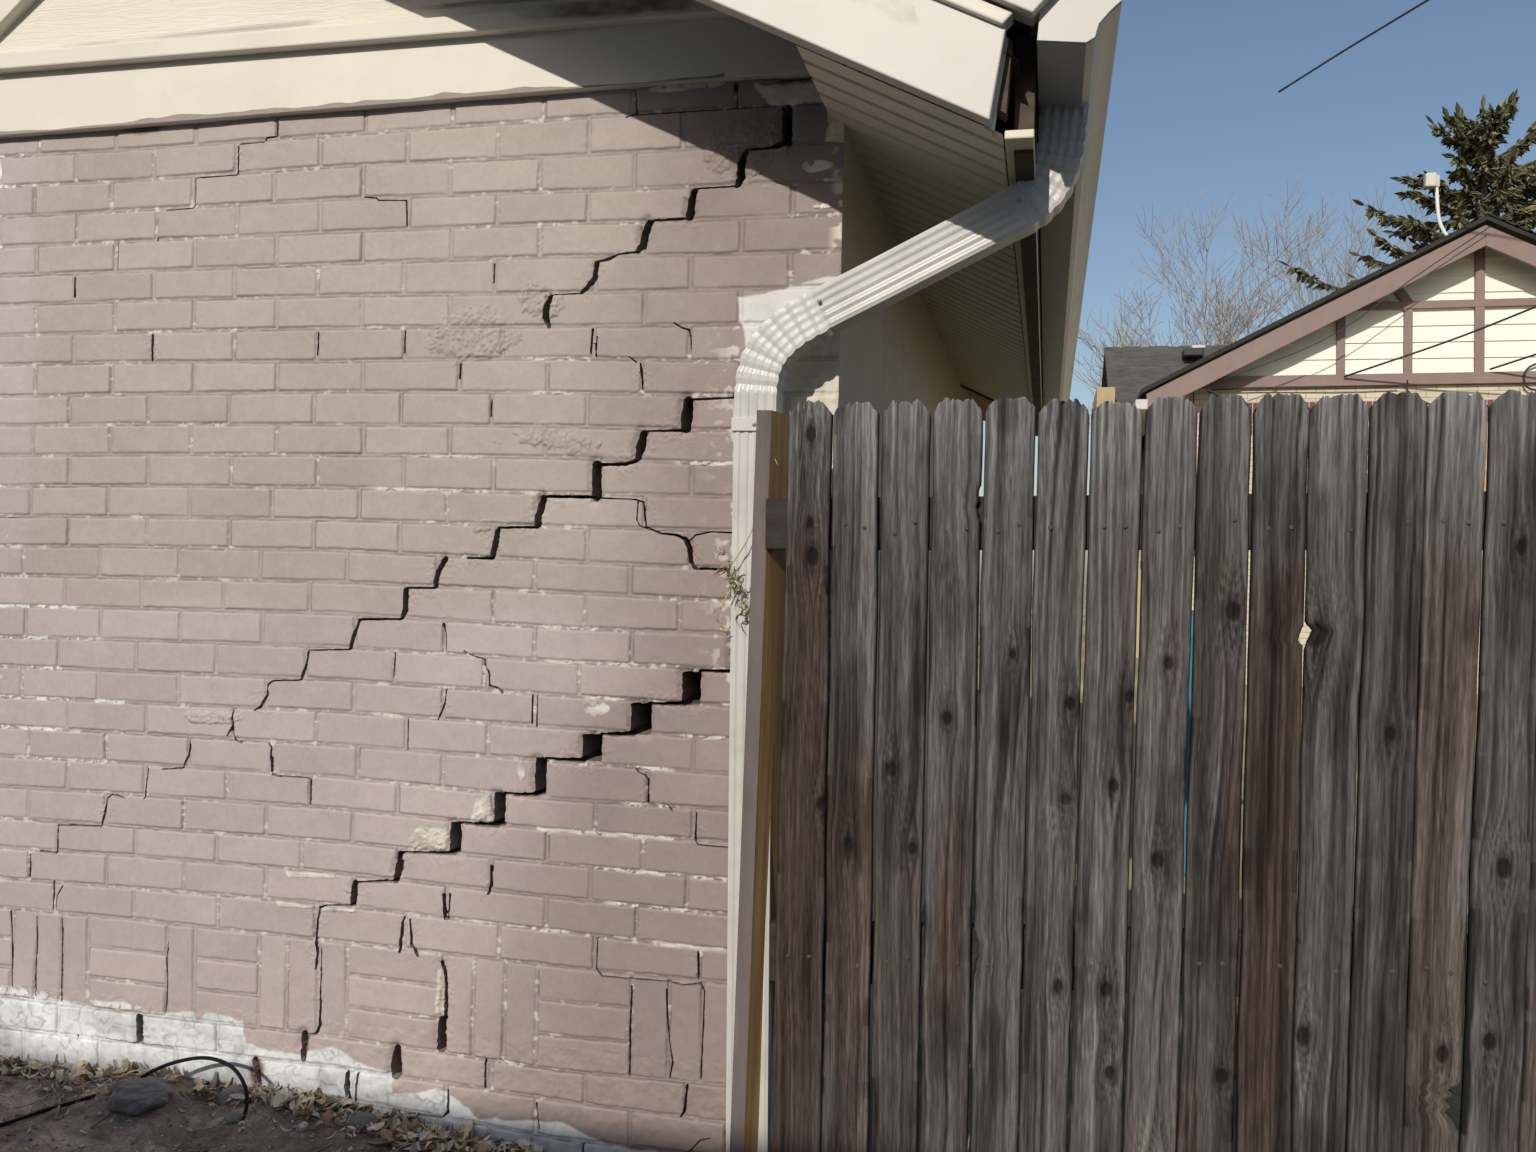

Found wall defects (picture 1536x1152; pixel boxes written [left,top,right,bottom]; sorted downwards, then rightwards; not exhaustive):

crack [157,118,279,241]
crack [364,197,408,227]
crack [542,92,793,390]
crack [148,334,156,362]
crack [10,363,740,1036]
spalling [470,793,494,822]
spalling [407,826,449,851]
peeling [0,986,49,1000]
peeling [76,1000,141,1010]
peeling [435,968,445,1023]
crack [596,937,726,1152]